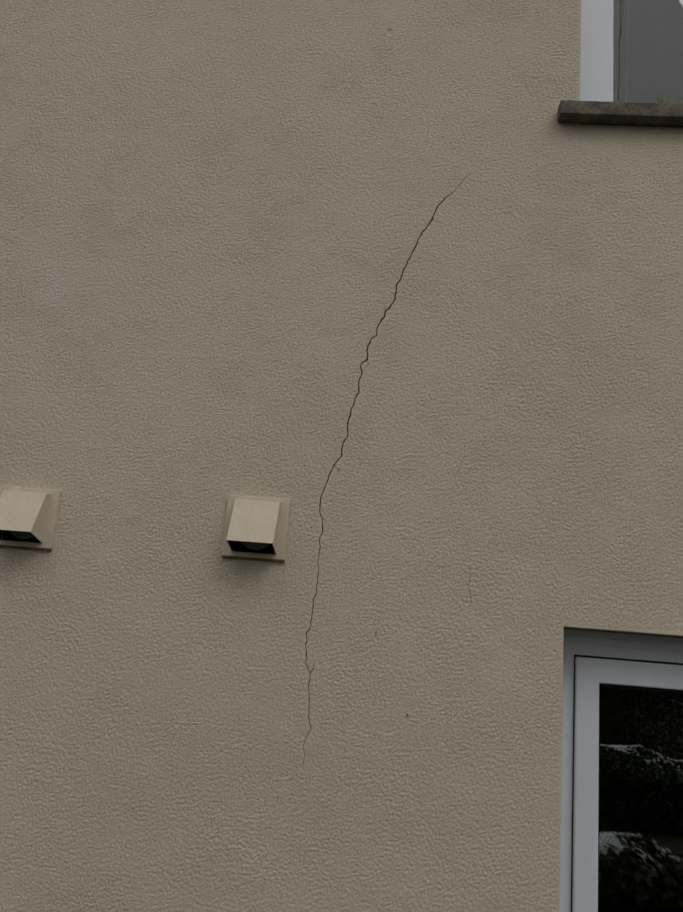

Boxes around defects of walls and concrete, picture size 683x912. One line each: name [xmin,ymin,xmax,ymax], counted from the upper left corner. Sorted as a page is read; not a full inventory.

crack [303,172,471,766]